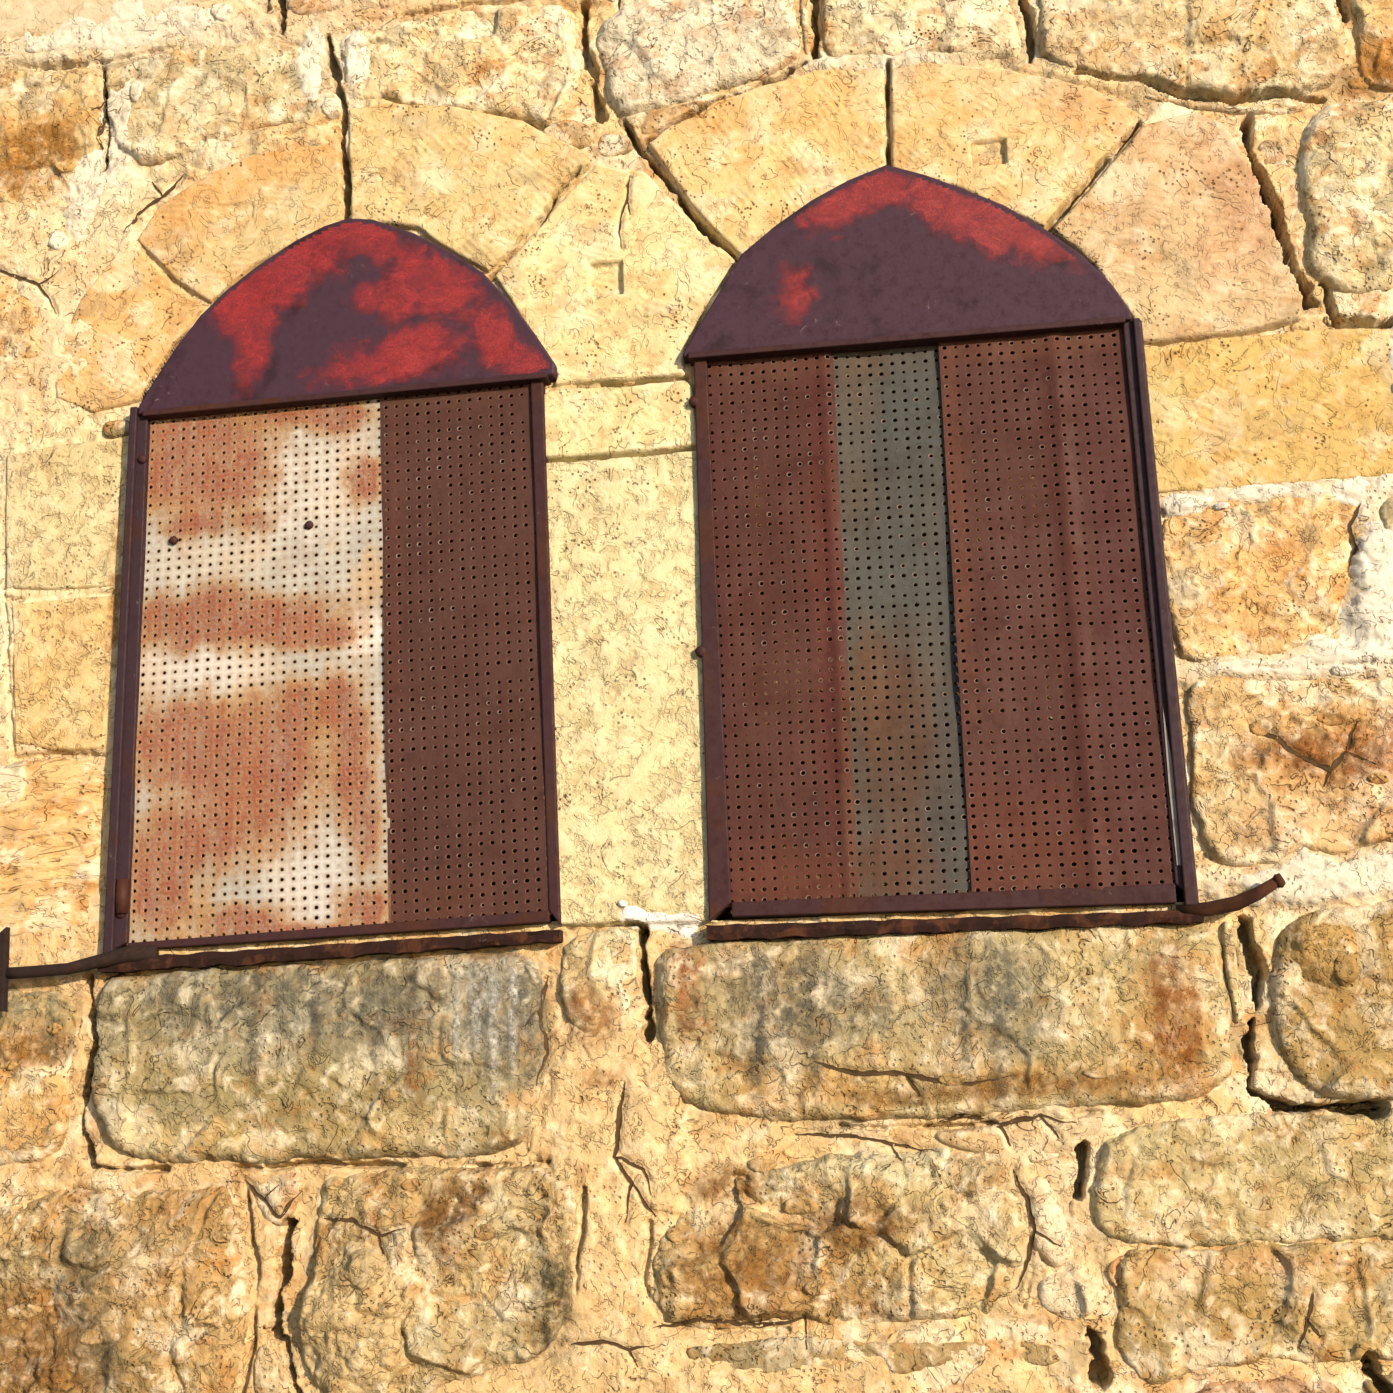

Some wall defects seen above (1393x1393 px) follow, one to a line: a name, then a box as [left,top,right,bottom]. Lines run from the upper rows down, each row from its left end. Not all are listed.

crack [0,269,59,314]
rust [147,401,370,540]
rust [343,455,382,508]
rust [141,581,370,658]
rust [130,671,389,939]
crack [613,1084,656,1223]